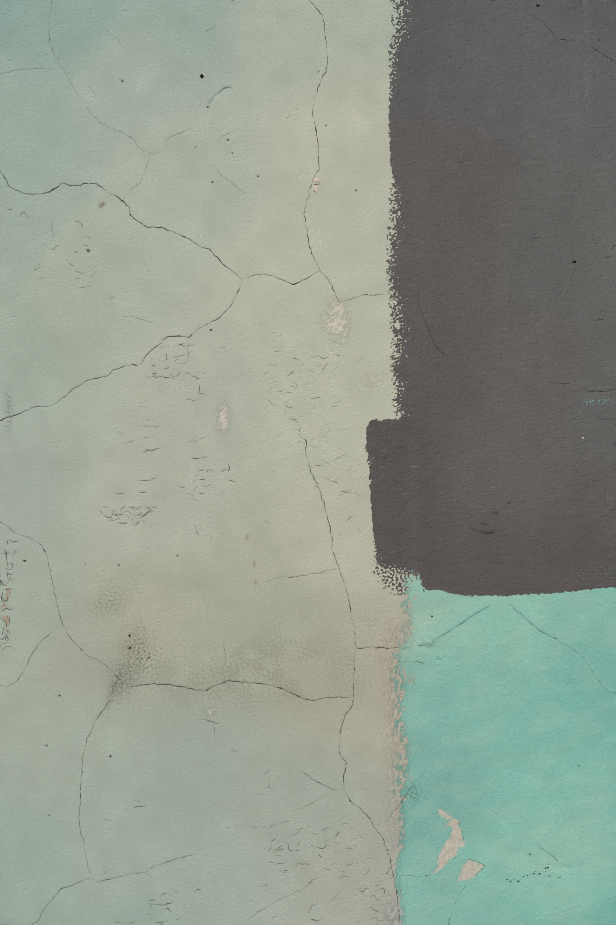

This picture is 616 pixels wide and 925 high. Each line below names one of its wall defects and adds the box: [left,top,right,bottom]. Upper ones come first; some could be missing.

crack [0,0,382,421]
peeling [0,540,19,650]
crack [0,341,616,925]
peeling [428,809,485,882]